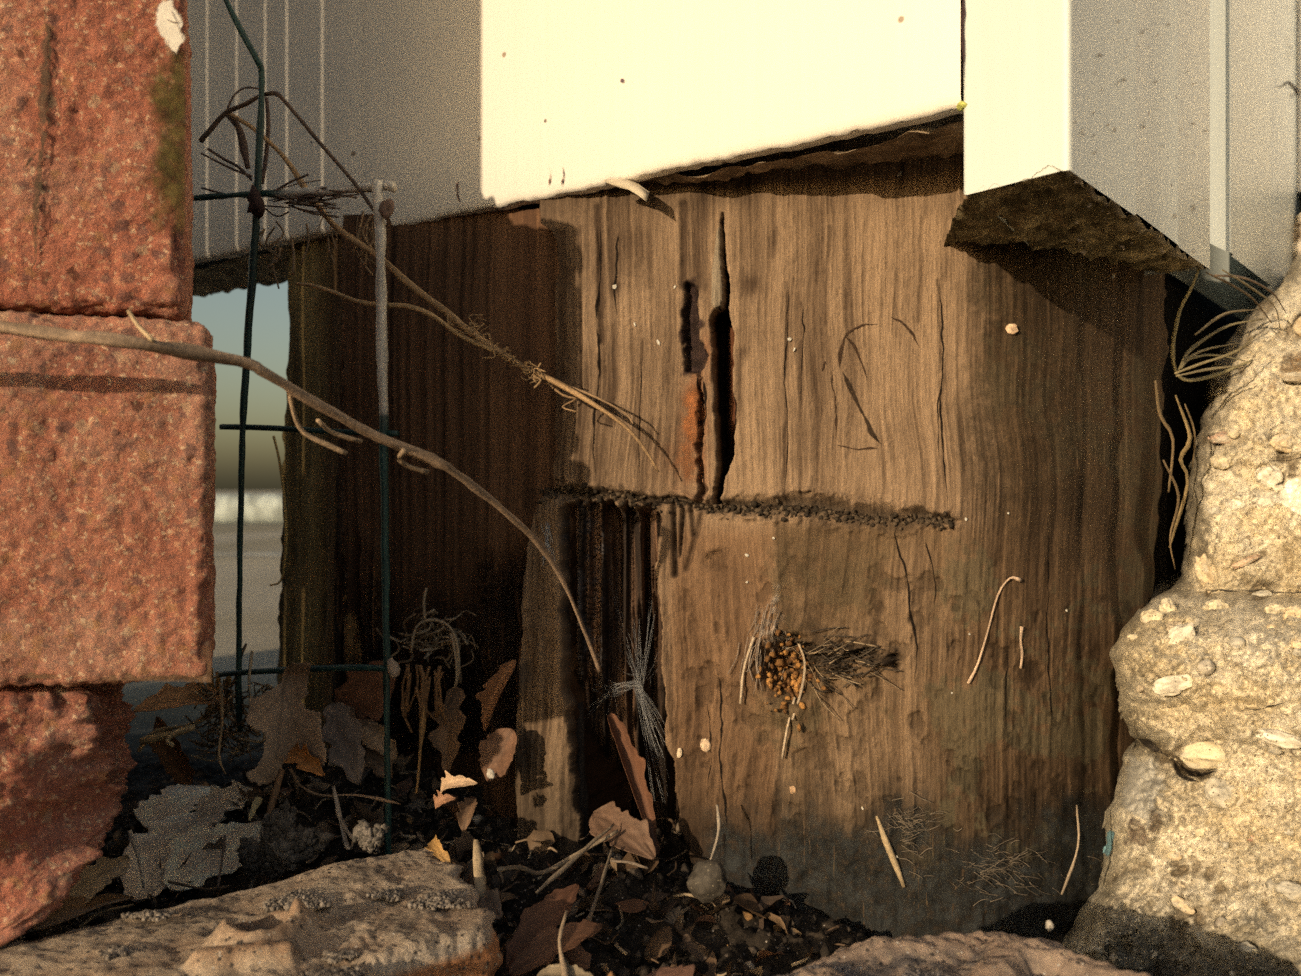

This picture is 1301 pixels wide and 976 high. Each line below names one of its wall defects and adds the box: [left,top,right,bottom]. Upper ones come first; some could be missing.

crack [696,262,737,491]
crack [1191,587,1301,595]
leakage [706,795,1106,940]